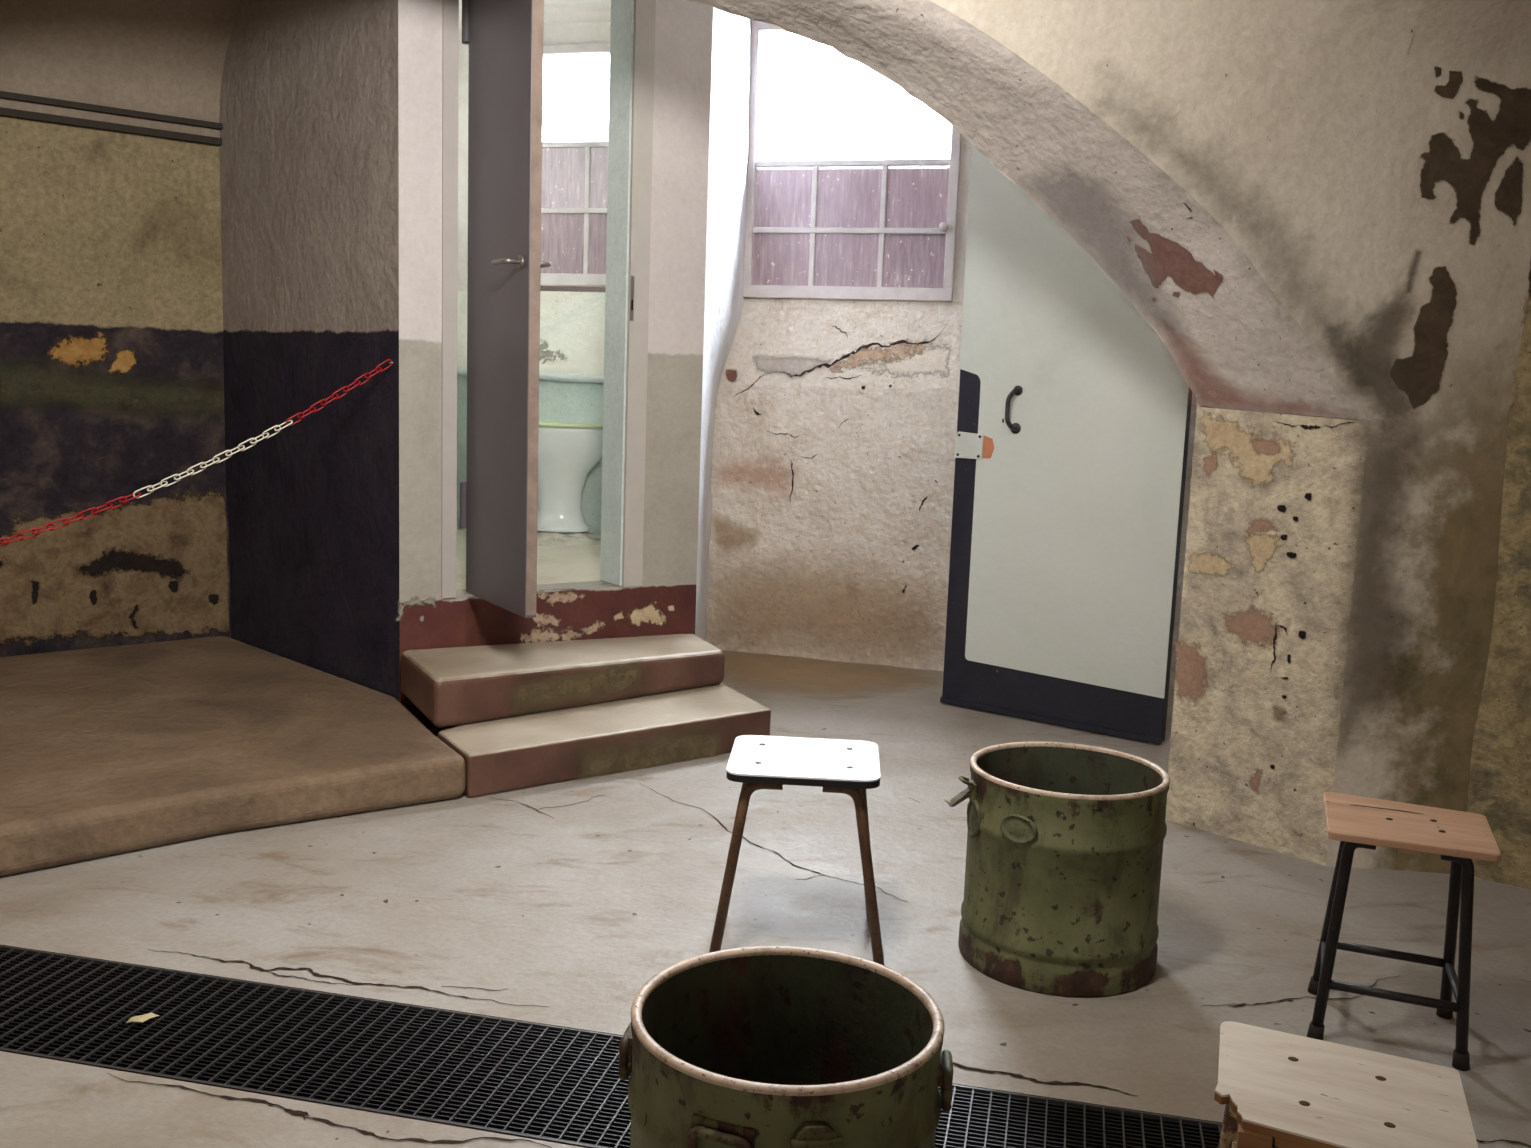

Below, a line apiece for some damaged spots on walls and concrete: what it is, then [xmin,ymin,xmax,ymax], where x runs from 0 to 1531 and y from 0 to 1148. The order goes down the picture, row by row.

flaking render [1420,67,1531,245]
flaking render [1127,219,1223,302]
flaking render [49,331,137,373]
crack [736,326,945,395]
water stain [1345,252,1420,418]
flaking render [1391,266,1457,408]
crack [768,431,817,499]
flaking render [0,490,229,650]
peeling [520,590,674,643]
water stain [1346,437,1402,713]
crack [149,949,546,1007]
crack [107,1073,552,1148]